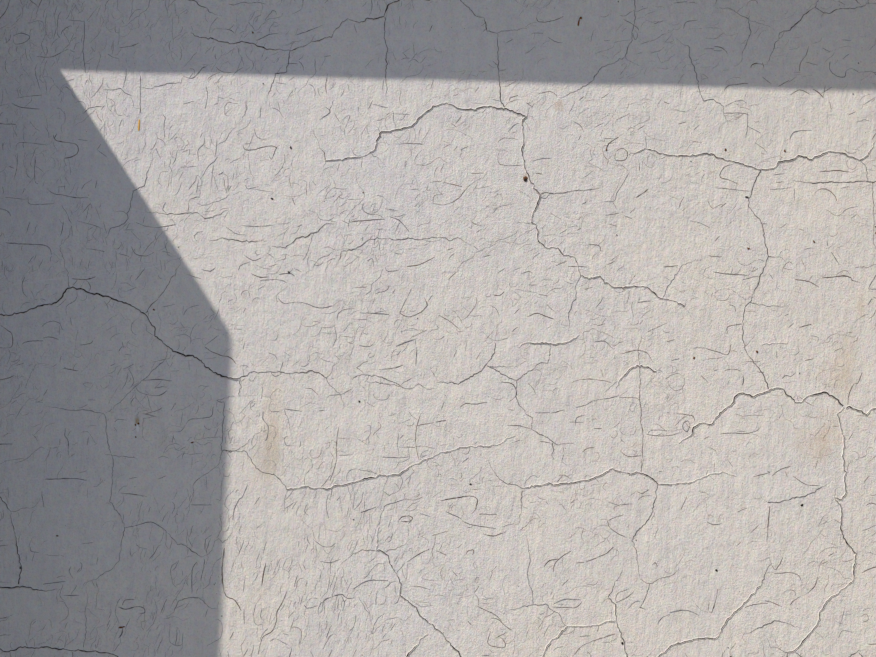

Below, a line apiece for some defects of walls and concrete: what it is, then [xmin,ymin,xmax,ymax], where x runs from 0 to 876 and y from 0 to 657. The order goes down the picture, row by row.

crack [15,425,103,497]
crack [0,489,121,620]